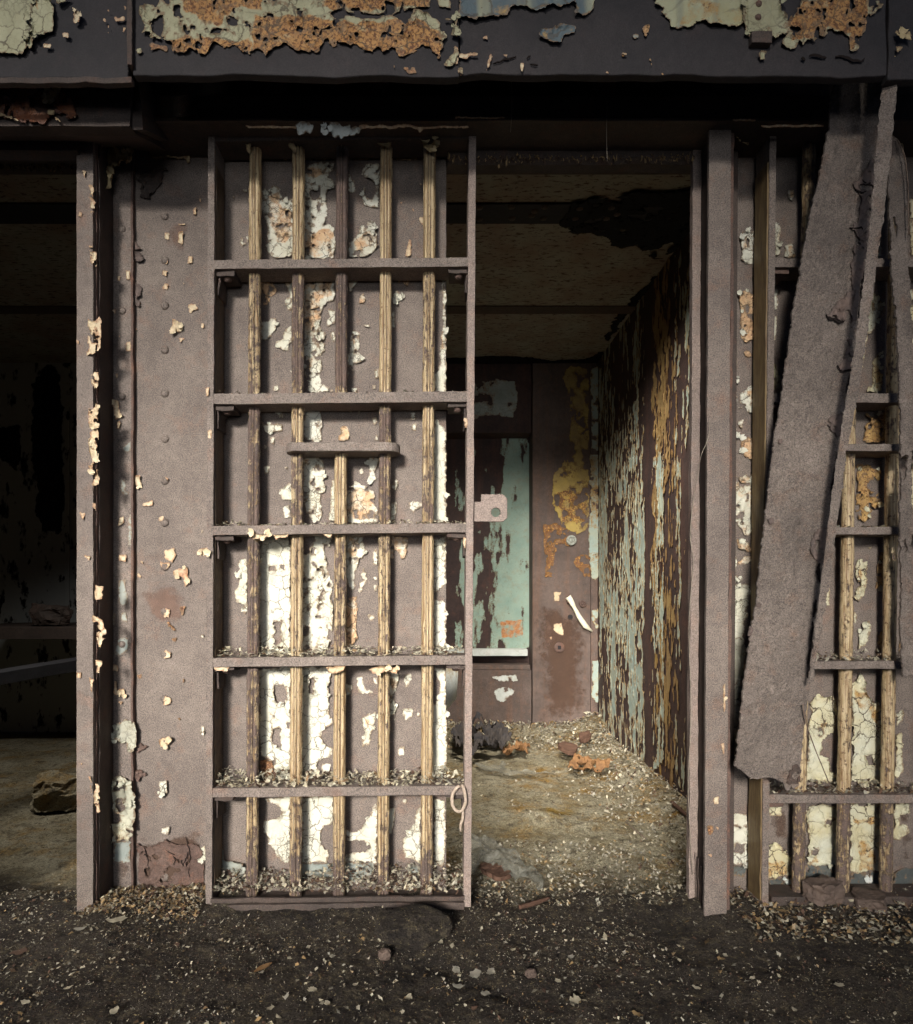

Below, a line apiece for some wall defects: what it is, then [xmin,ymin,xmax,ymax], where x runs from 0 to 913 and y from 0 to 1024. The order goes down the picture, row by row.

peeling [0,0,82,55]
peeling [136,0,595,76]
peeling [655,0,883,52]
peeling [261,162,380,260]
peeling [737,289,754,358]
peeling [736,376,753,460]
rust [733,81,913,791]
peeling [0,190,711,1024]
peeling [807,694,837,784]
peeling [851,674,881,787]
peeling [895,710,905,778]
rust [136,839,205,890]